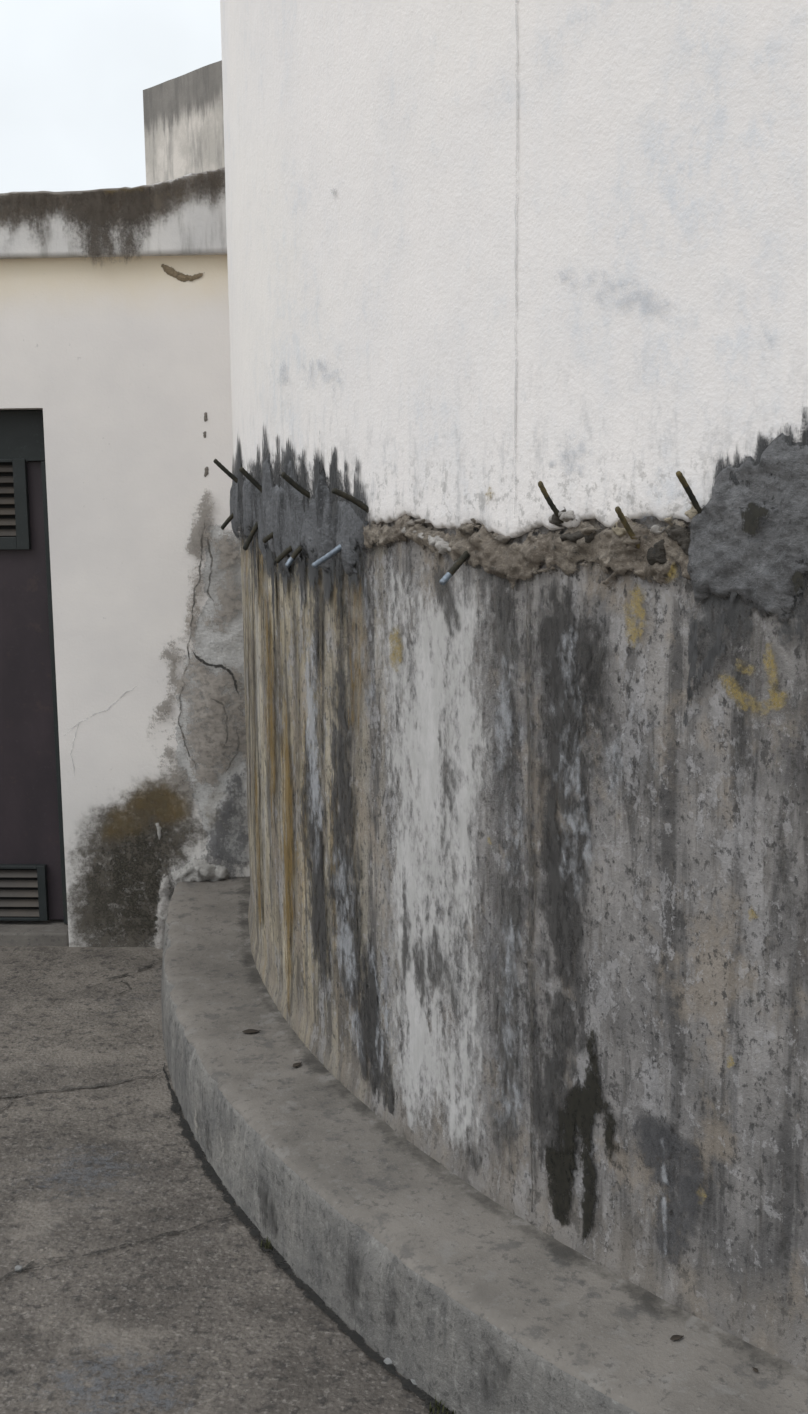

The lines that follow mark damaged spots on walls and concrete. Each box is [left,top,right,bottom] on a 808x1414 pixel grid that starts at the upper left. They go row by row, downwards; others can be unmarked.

water stain [77,172,224,260]
water stain [68,562,330,999]
water stain [683,592,780,787]
water stain [362,952,394,1115]
water stain [532,1030,708,1266]